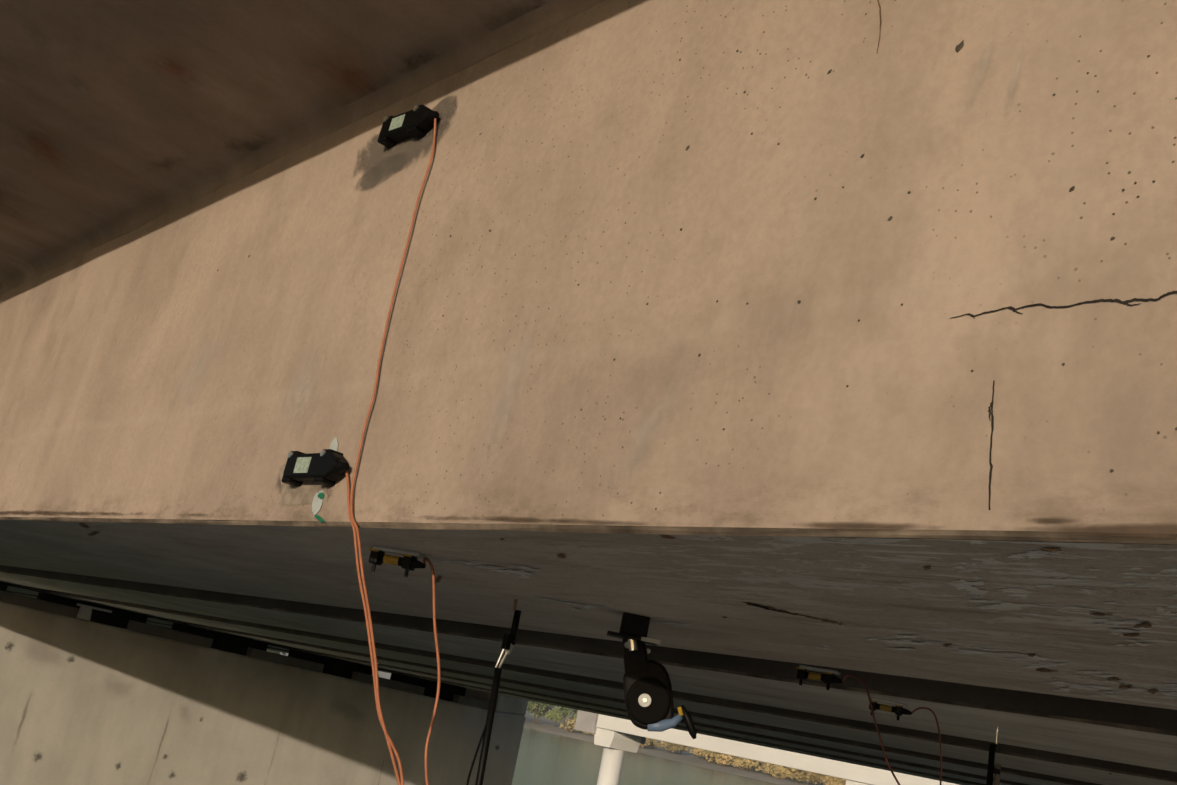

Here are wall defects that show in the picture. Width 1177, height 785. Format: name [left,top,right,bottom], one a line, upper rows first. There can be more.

crack [875,0,883,54]
crack [952,291,1177,319]
crack [987,380,995,510]
spalling [743,602,845,625]
peeling [946,562,1153,646]
peeling [868,635,1177,699]